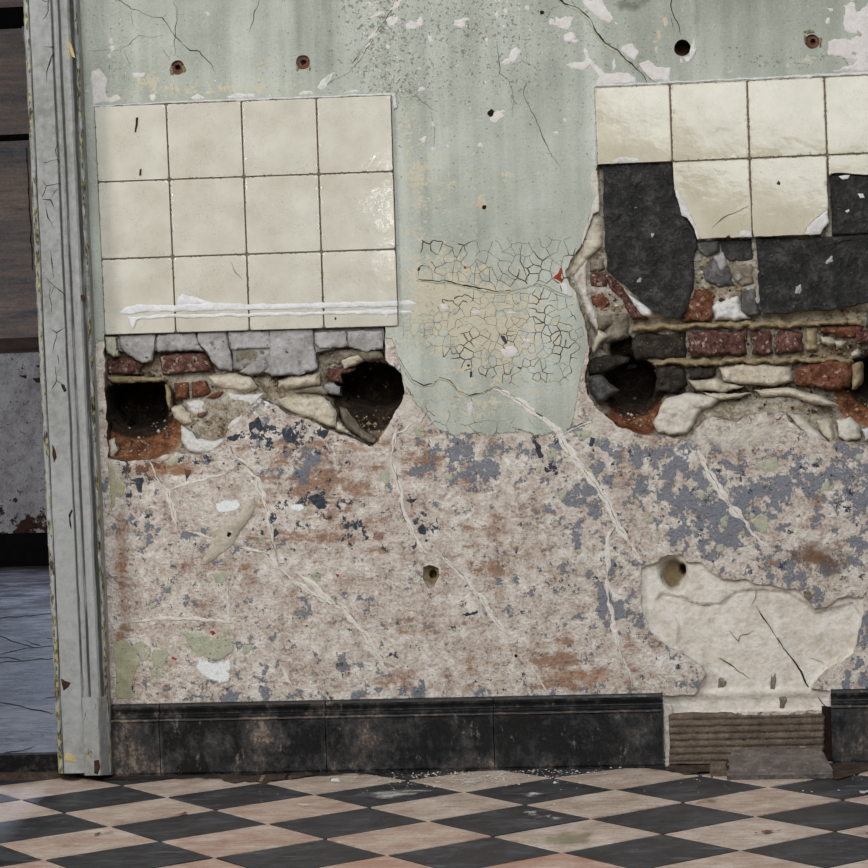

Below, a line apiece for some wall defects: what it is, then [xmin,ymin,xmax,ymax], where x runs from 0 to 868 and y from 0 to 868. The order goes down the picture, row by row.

crack [91,0,215,72]
crack [328,0,398,84]
crack [559,0,647,83]
peeling [549,16,670,85]
spalling [680,38,697,63]
peeling [803,0,868,71]
crack [496,42,560,166]
spalling [553,154,868,461]
spalling [103,327,405,510]
peeling [290,494,327,518]
crack [391,237,643,694]
spalling [640,554,865,767]